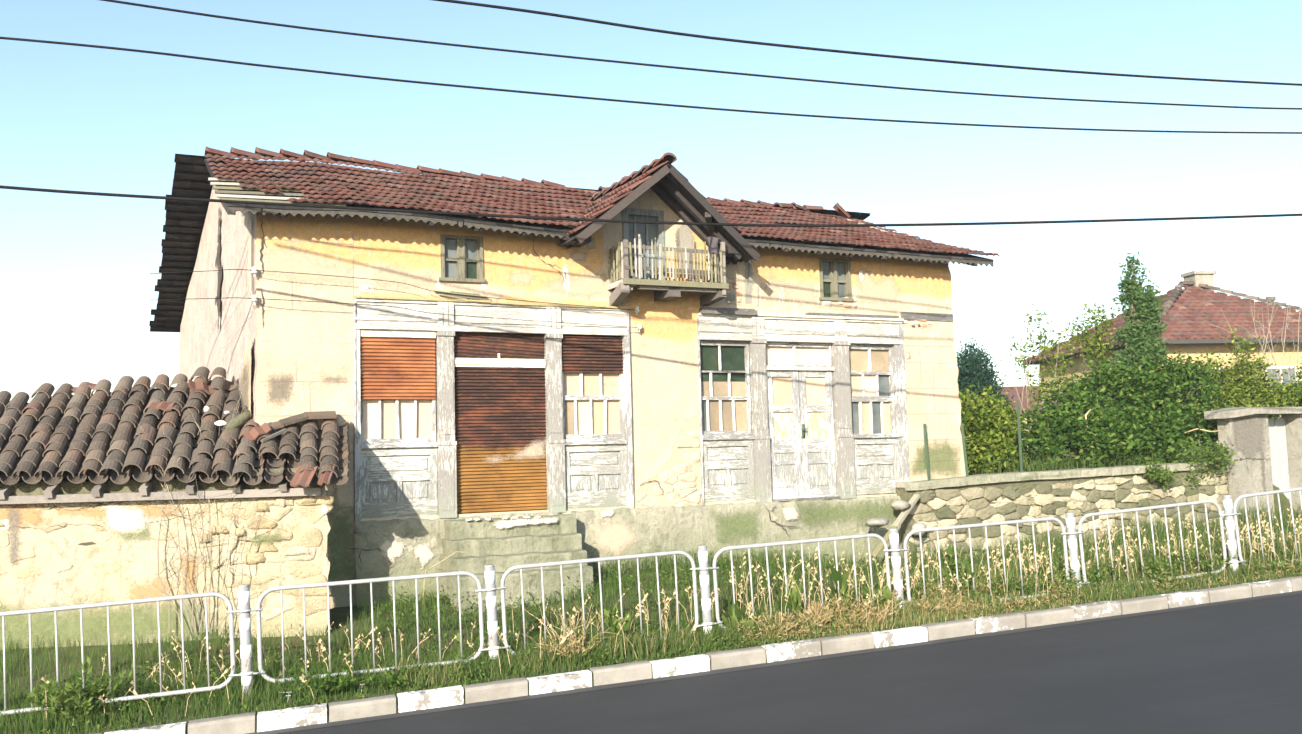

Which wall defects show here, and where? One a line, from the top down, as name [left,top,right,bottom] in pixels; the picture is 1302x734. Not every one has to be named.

crack [214,208,222,329]
crack [259,219,267,326]
leakage [270,378,289,401]
spalling [634,355,702,508]